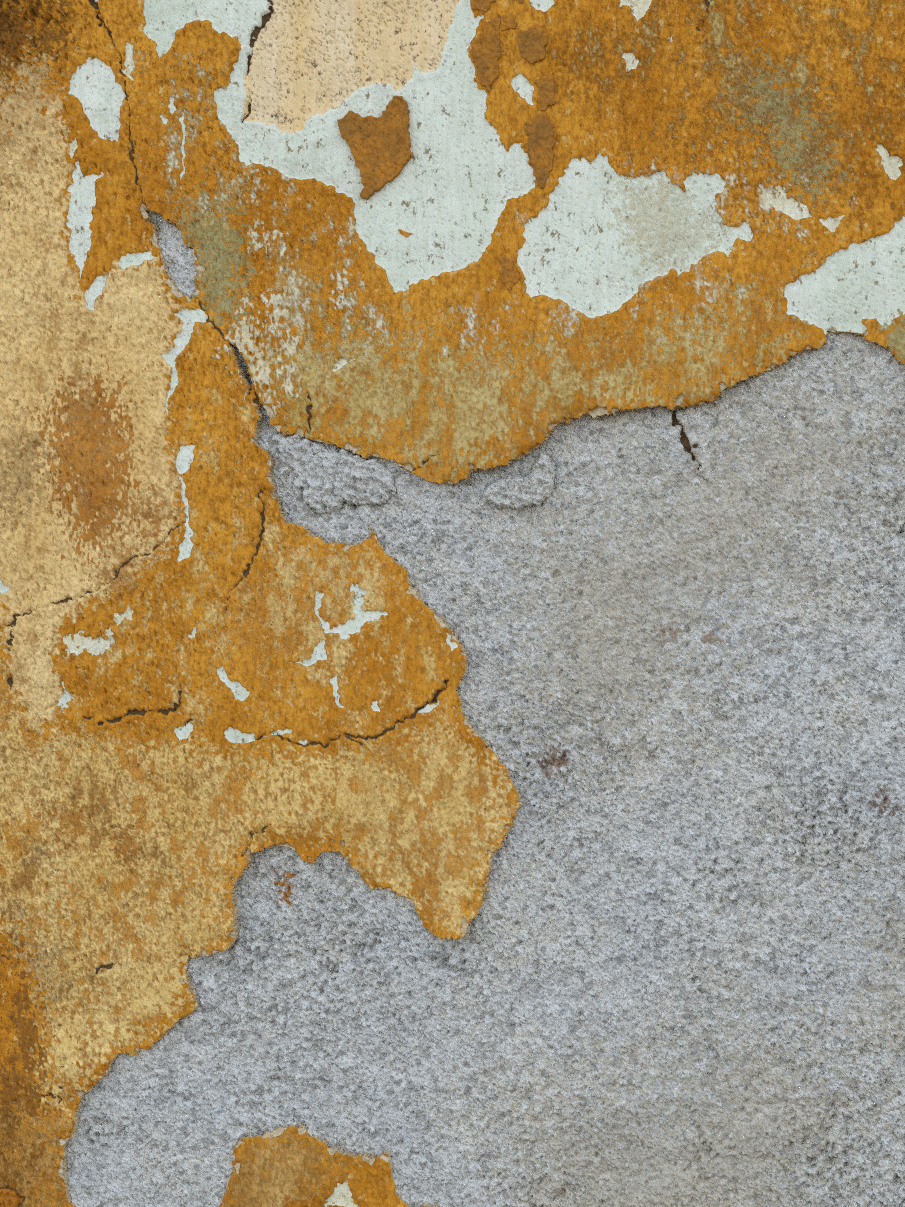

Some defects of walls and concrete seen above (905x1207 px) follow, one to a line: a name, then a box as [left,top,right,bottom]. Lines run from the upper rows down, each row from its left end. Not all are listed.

peeling [62,57,126,142]
crack [89,0,143,203]
peeling [122,42,143,81]
peeling [142,0,845,352]
peeling [875,144,903,180]
peeling [329,259,389,372]
crack [672,410,701,470]
crack [226,490,265,611]
crack [7,522,185,690]
crack [84,686,193,730]
peeling [209,666,266,701]
crack [255,680,449,748]